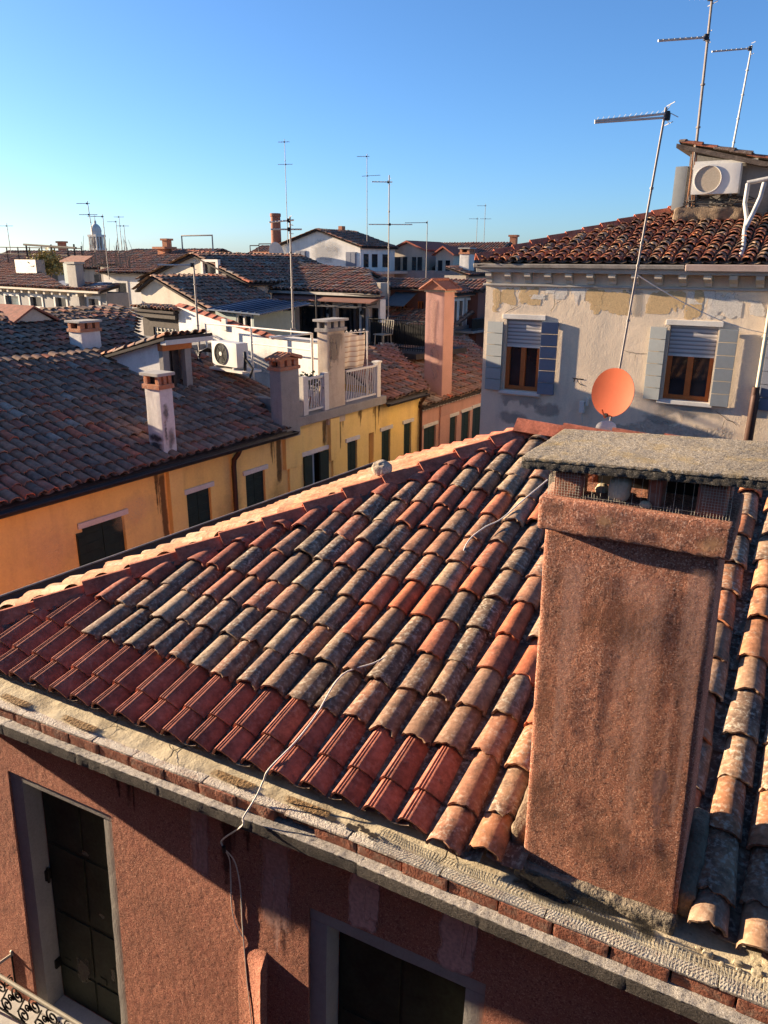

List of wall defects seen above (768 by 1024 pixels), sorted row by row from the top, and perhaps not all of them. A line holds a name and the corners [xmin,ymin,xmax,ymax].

peeling [492,287,630,316]
peeling [645,291,765,320]